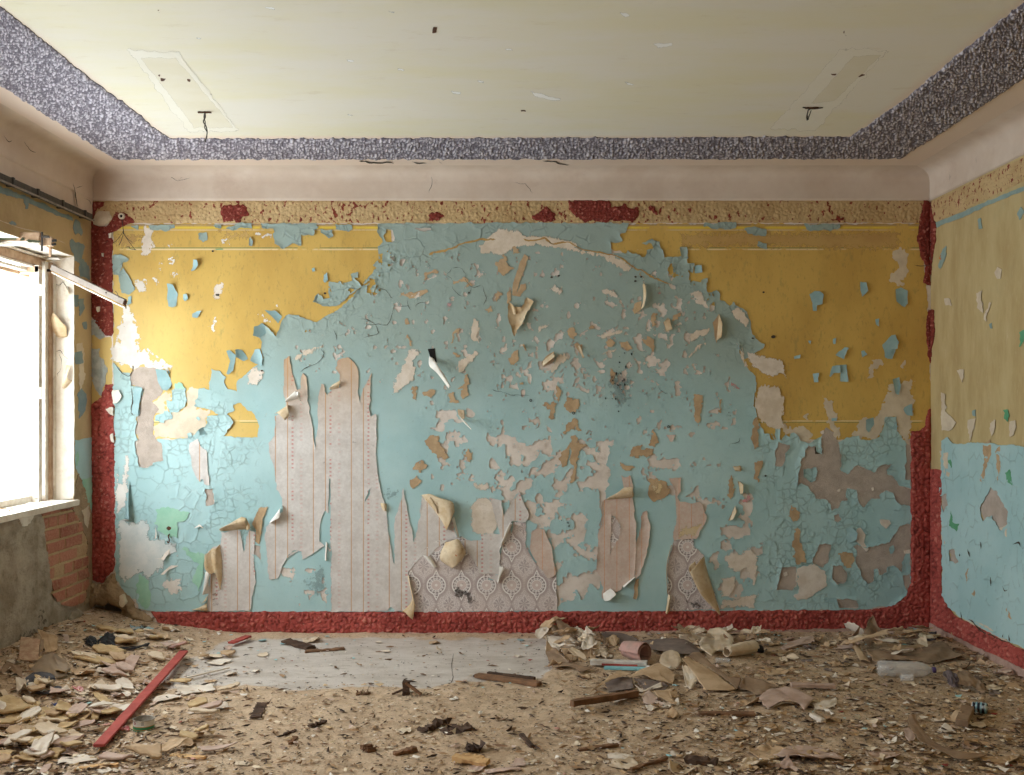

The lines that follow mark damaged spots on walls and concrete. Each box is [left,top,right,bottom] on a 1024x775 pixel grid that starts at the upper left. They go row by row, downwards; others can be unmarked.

crack [429,238,496,305]
crack [524,237,668,284]
peeling [0,186,1024,649]